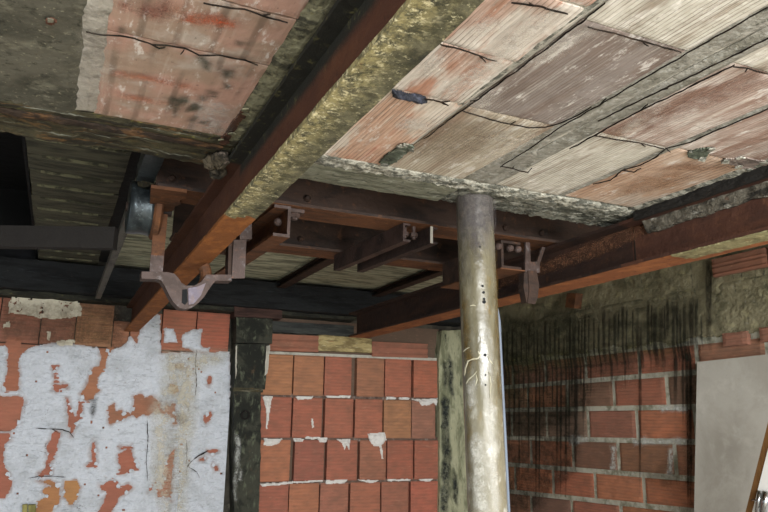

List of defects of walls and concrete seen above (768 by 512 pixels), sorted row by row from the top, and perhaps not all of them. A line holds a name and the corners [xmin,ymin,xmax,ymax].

crack [203,2,288,24]
crack [86,31,258,66]
crack [423,2,768,185]
spalling [687,147,716,162]
flaking render [0,337,24,498]
flaking render [35,347,114,512]
flaking render [98,445,140,512]
flaking render [106,382,180,424]
flaking render [149,449,175,500]
water stain [233,436,242,499]
water stain [441,361,458,510]
water stain [503,265,712,509]